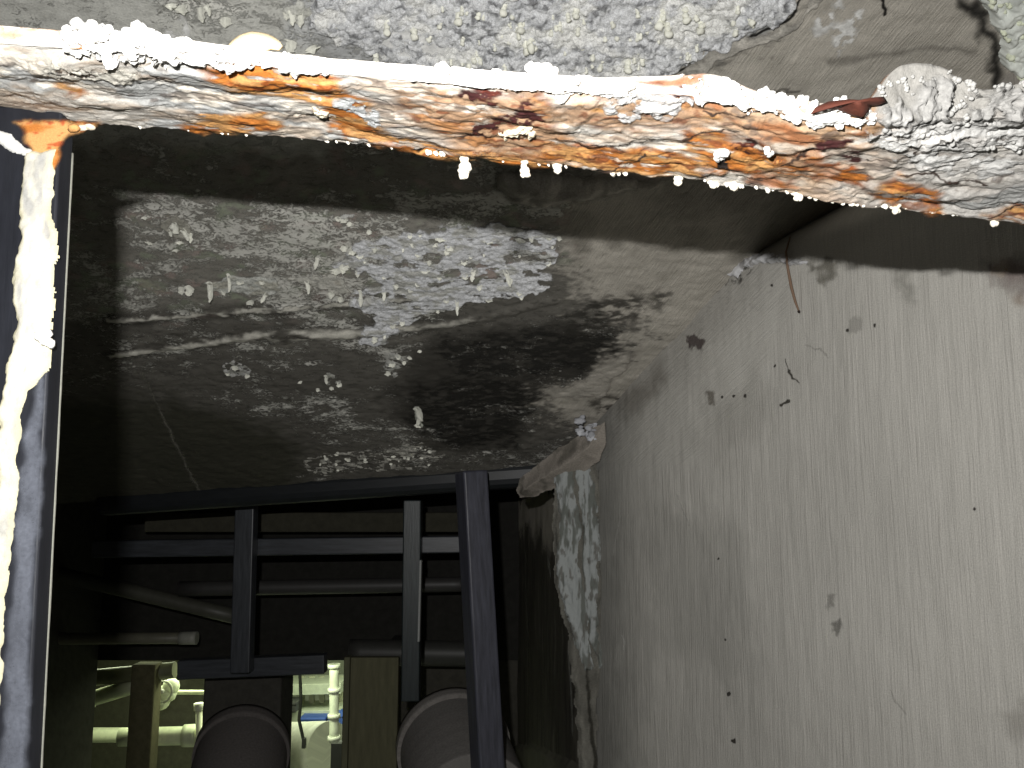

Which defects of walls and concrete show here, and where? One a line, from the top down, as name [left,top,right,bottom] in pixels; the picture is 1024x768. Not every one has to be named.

corrosion [18,120,96,169]
corrosion [56,83,84,93]
corrosion [183,112,283,135]
corrosion [205,31,870,186]
corrosion [810,97,887,139]
corrosion [876,180,941,214]
corrosion [989,203,1024,222]
water stain [412,295,643,448]
water stain [0,131,60,684]